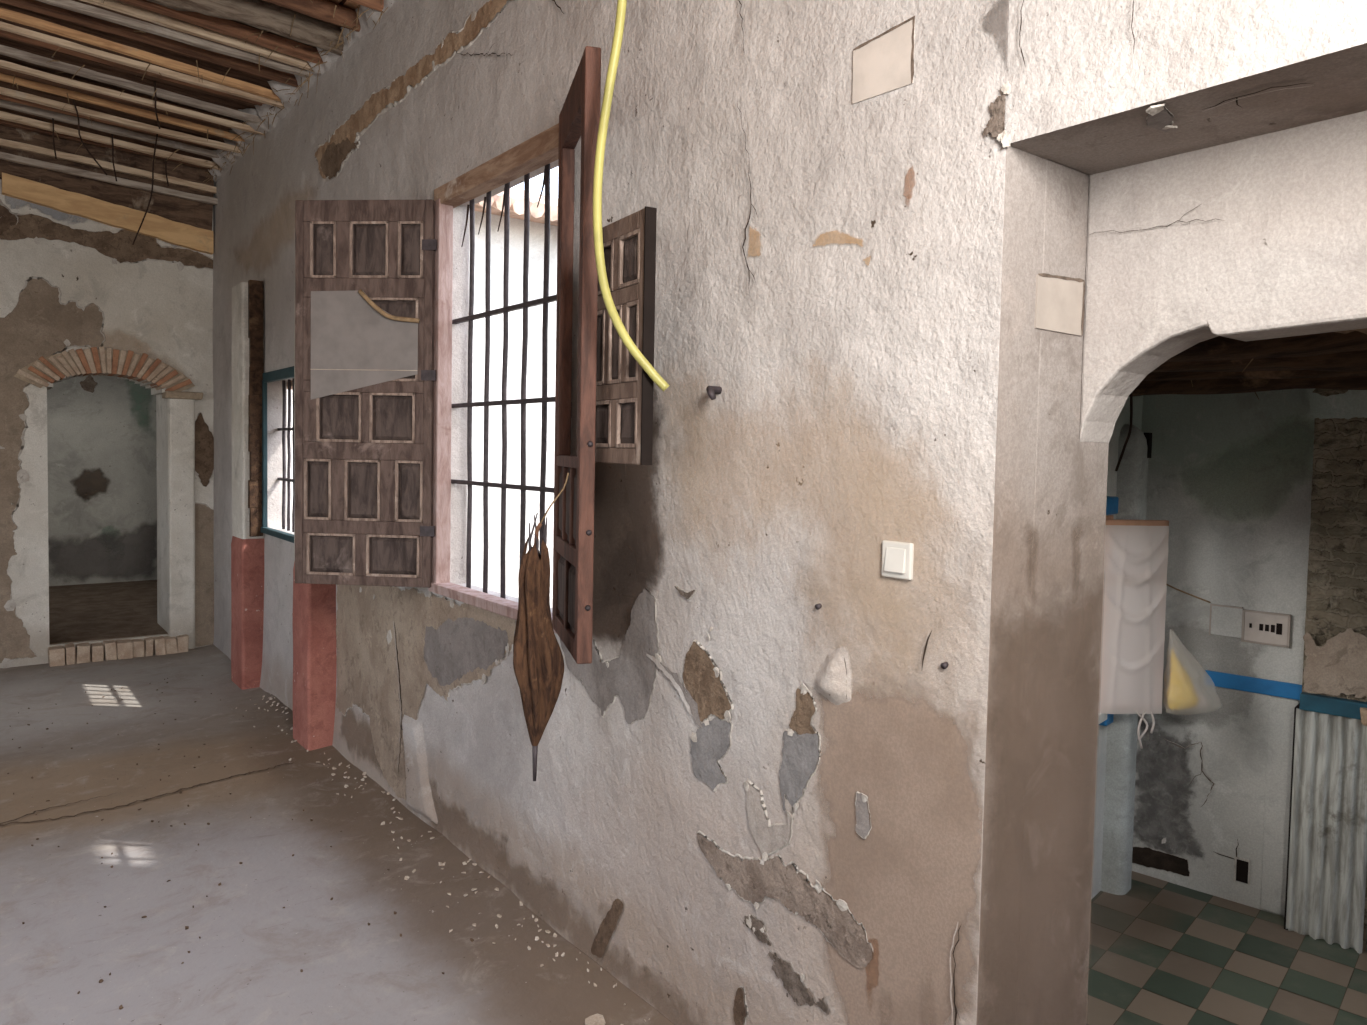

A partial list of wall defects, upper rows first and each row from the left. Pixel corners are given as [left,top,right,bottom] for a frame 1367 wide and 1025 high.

flaking render [0,199,213,271]
spalling [315,0,516,182]
crack [735,0,745,54]
crack [736,102,758,283]
spalling [983,82,1011,148]
flaking render [0,276,106,668]
flaking render [195,412,214,647]
flaking render [336,585,516,801]
flaking render [646,627,873,1015]
water stain [1133,721,1203,857]
spalling [591,898,623,958]
crack [950,923,962,1025]